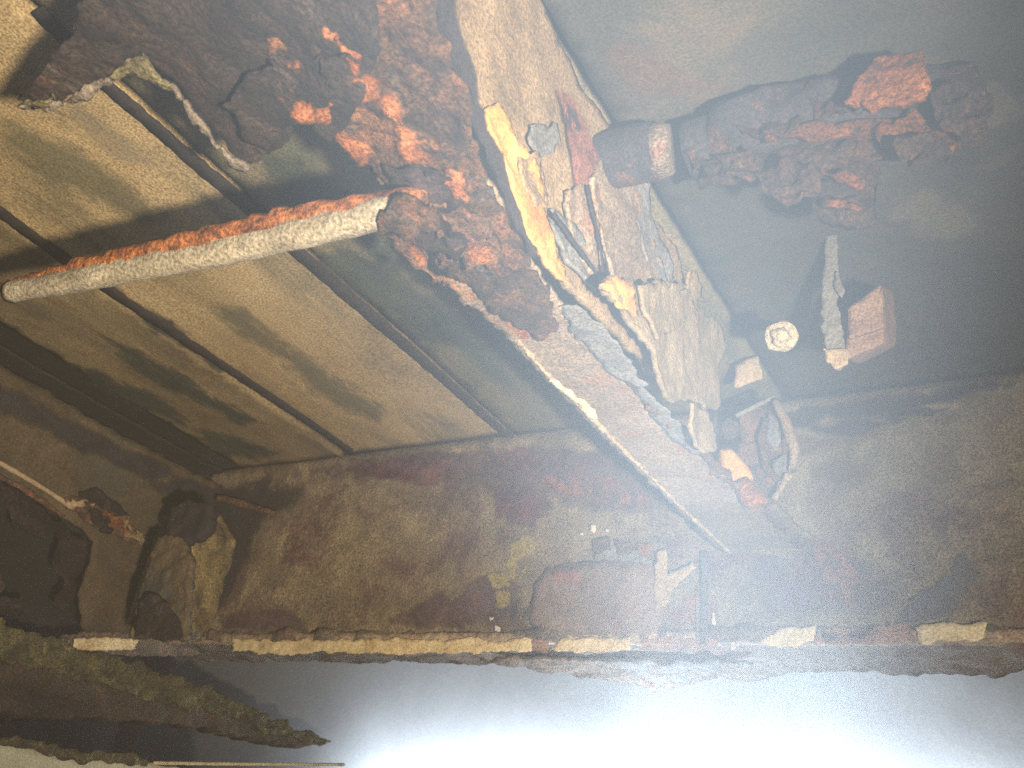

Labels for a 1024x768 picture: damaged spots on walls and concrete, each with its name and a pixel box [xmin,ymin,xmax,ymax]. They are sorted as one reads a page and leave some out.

corrosion [291,101,372,166]
corrosion [322,27,469,202]
corrosion [713,107,965,208]
corrosion [0,187,444,304]
peeling [383,162,505,284]
corrosion [466,246,496,265]
spalling [484,103,726,455]
corrosion [64,488,151,548]
peeling [73,637,139,651]